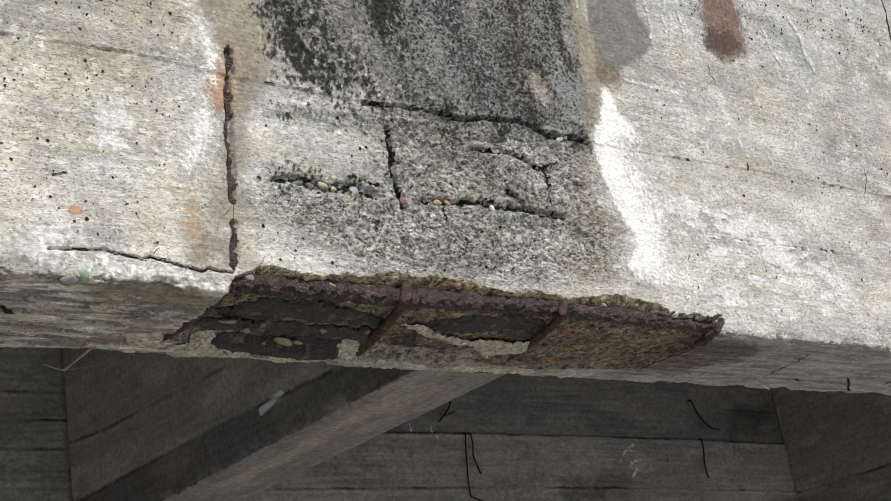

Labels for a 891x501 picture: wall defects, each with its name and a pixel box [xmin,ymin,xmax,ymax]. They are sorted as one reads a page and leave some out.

corrosion [698,0,746,62]
corrosion [205,53,246,115]
leakage [76,95,140,153]
leakage [179,0,861,335]
crack [51,247,227,273]
spalling [60,264,725,378]